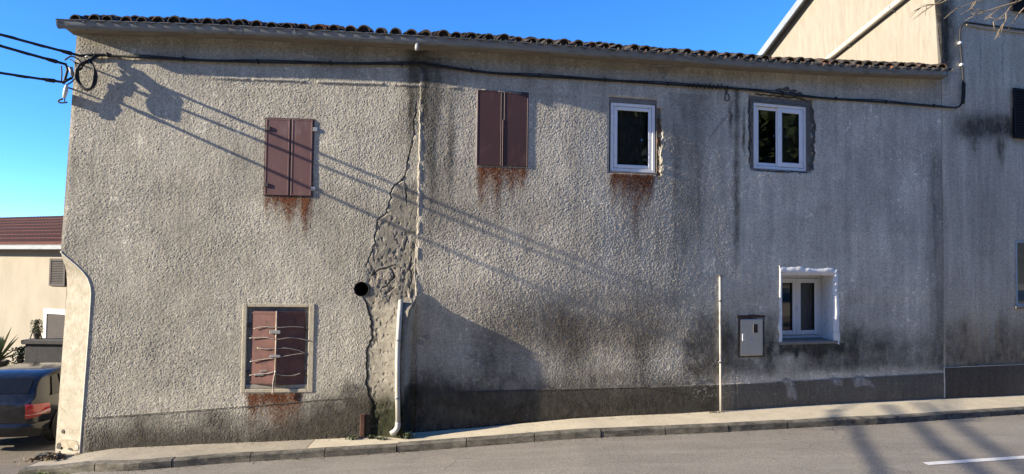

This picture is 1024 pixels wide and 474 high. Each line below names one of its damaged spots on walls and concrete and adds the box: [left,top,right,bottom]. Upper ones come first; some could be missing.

water stain [962,115,1013,153]
rust [265,197,309,221]
crack [366,105,417,266]
spalling [367,103,422,303]
rust [611,173,653,206]
water stain [723,334,871,369]
rust [248,393,301,420]
water stain [383,383,716,433]